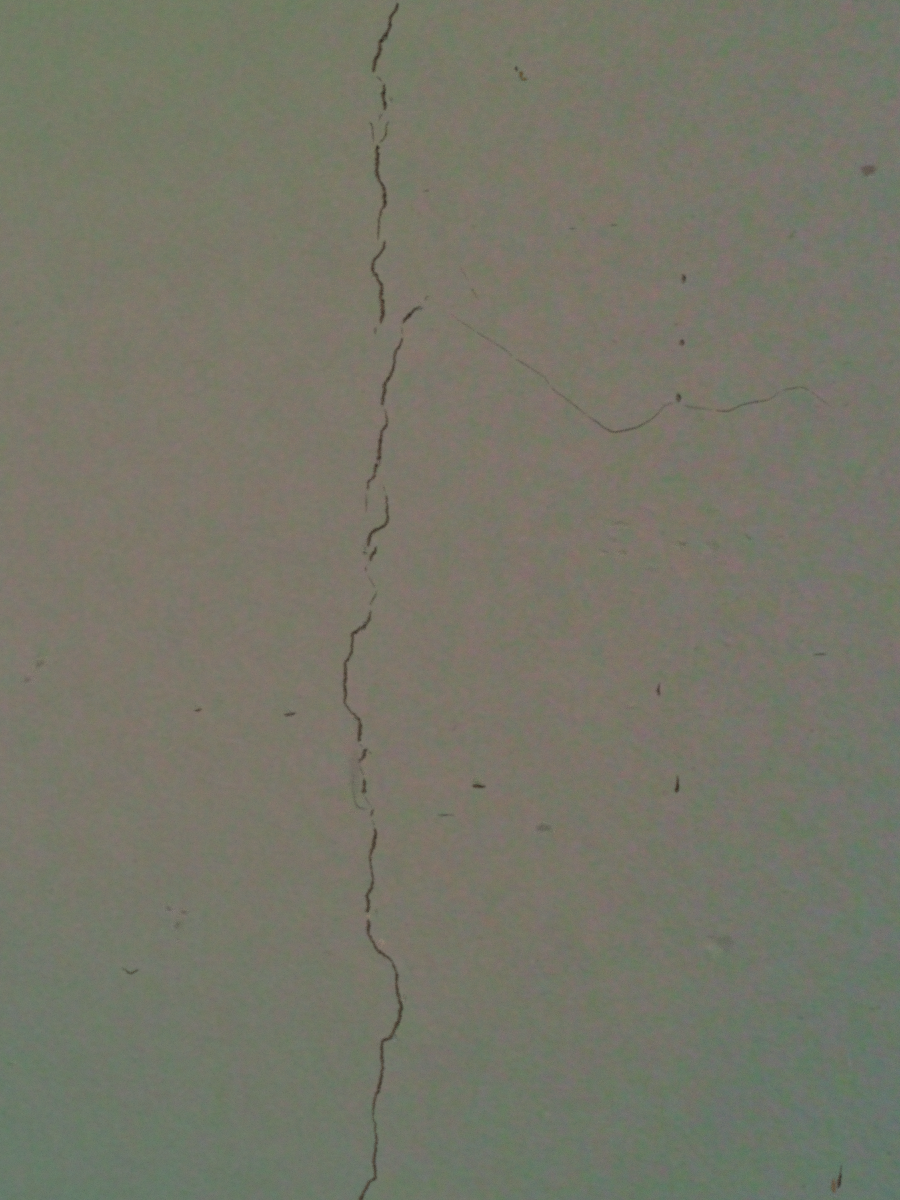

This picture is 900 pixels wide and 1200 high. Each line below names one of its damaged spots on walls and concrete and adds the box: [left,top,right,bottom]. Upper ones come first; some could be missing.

crack [343,2,830,1200]